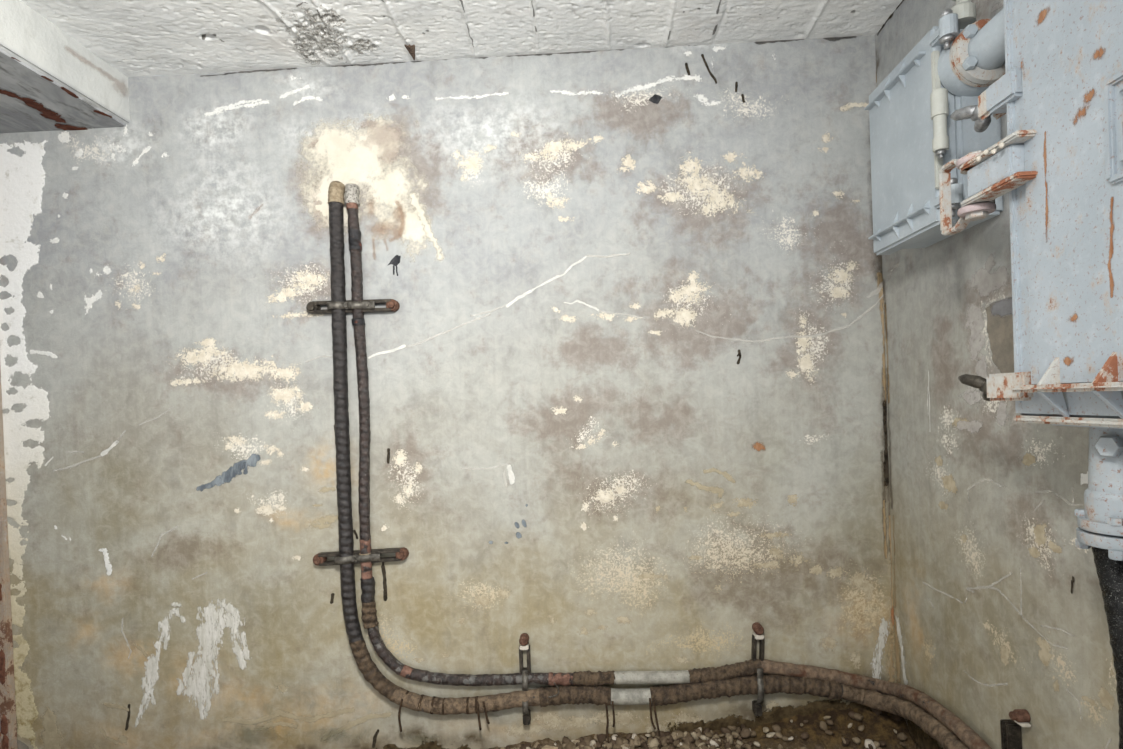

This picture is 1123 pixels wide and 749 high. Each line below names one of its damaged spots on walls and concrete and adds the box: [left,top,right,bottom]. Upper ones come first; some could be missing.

spalling [275,5,378,64]
crack [668,0,745,103]
rust [0,89,88,130]
peeling [204,75,323,117]
peeling [0,131,84,749]